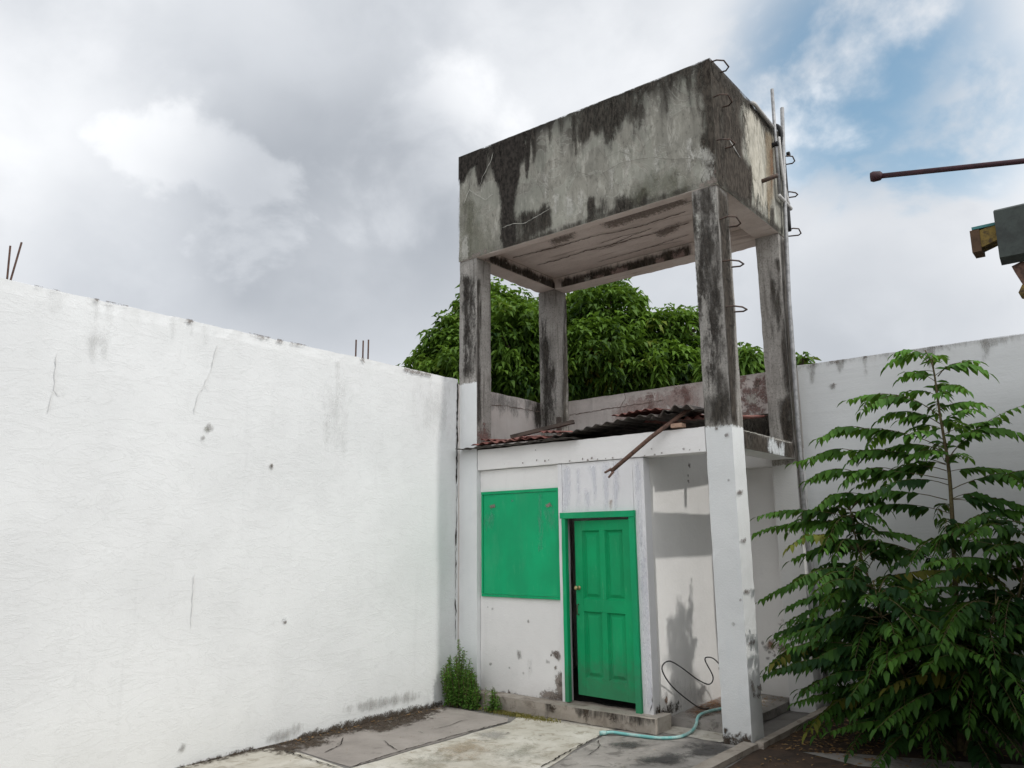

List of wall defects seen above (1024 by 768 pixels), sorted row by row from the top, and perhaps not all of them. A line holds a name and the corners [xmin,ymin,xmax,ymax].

crack [513,212,688,265]
leakage [458,58,802,518]
peeling [539,651,563,701]